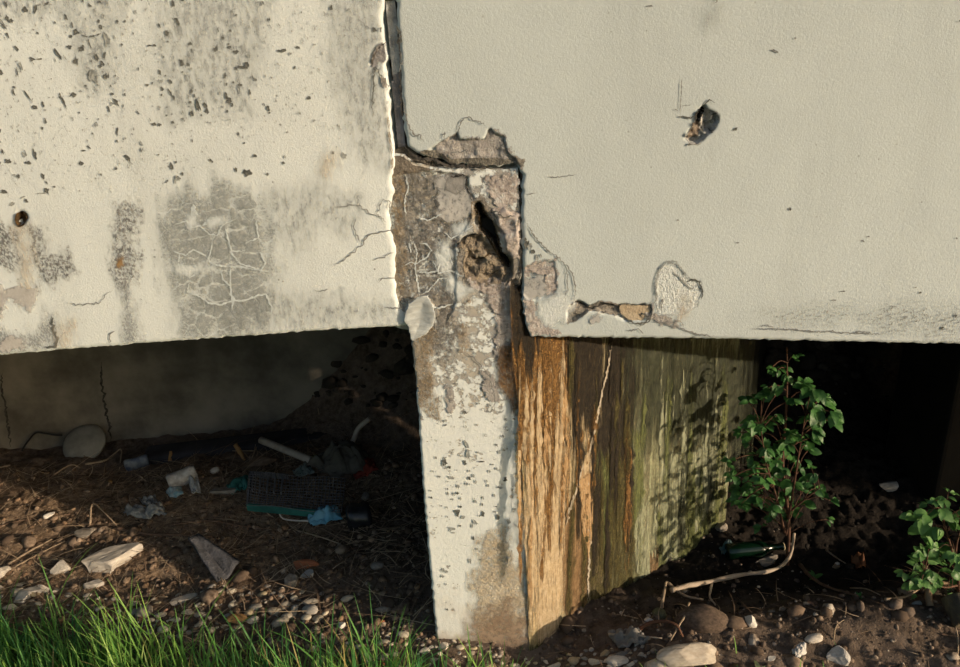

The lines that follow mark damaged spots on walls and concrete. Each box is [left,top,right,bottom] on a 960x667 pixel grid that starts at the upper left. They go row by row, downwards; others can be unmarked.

crack [358,0,576,330]
flaking render [675,81,719,146]
leakage [0,223,75,287]
leakage [159,181,358,338]
crack [331,199,396,283]
crack [0,375,11,447]
crack [43,318,59,349]
crack [100,331,114,440]
flaking render [391,116,703,650]
leakage [506,280,755,650]